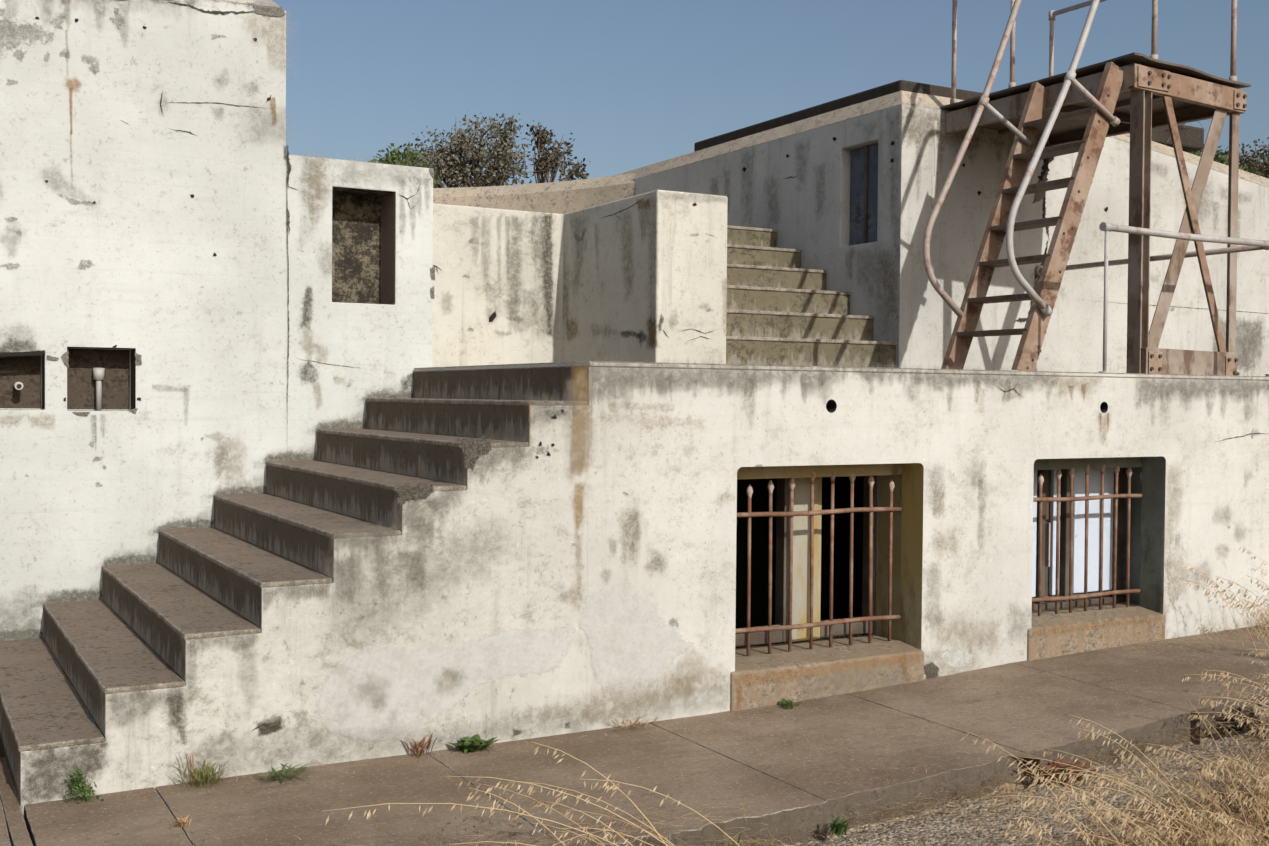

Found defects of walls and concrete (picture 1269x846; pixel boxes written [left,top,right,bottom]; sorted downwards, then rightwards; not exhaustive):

peeling [0,0,99,74]
crack [160,90,363,453]
damp [543,215,553,335]
damp [592,366,838,394]
damp [112,693,185,743]
damp [258,717,282,735]
damp [23,740,107,804]